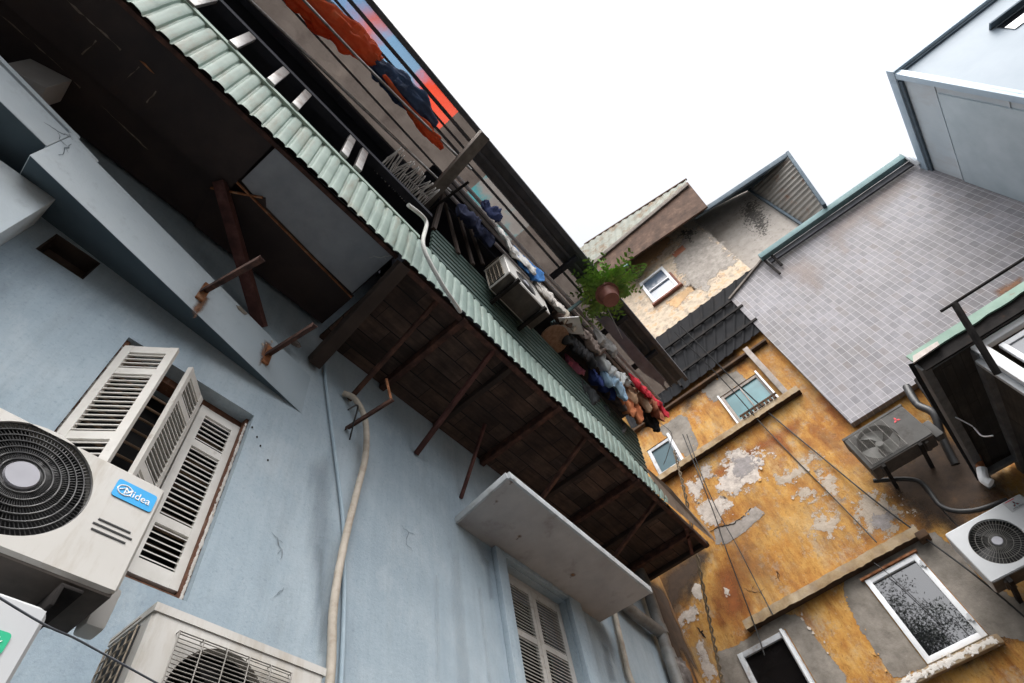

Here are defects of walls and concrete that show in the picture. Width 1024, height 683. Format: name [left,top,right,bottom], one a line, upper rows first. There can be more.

crack [44,122,73,155]
water stain [736,196,771,239]
flaking render [628,219,738,308]
peeling [680,446,916,545]
peeling [678,583,703,634]
peeling [885,636,1000,683]